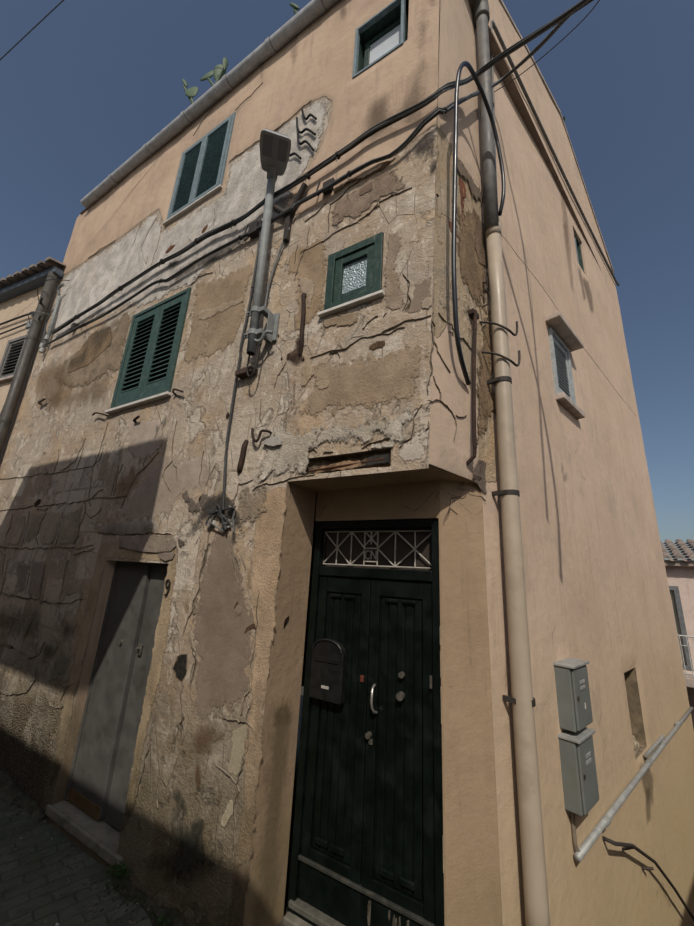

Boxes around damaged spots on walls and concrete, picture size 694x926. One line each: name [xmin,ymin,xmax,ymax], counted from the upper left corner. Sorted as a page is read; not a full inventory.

peeling [52,100,328,390]
crack [259,362,286,426]
peeling [255,232,432,482]
crack [310,274,491,448]
crack [0,420,216,658]
crack [130,715,172,845]
peeling [98,420,219,561]
water stain [152,792,222,881]
peeling [192,520,256,719]
peeling [221,800,233,827]
peeling [227,724,247,776]
crack [178,474,314,868]